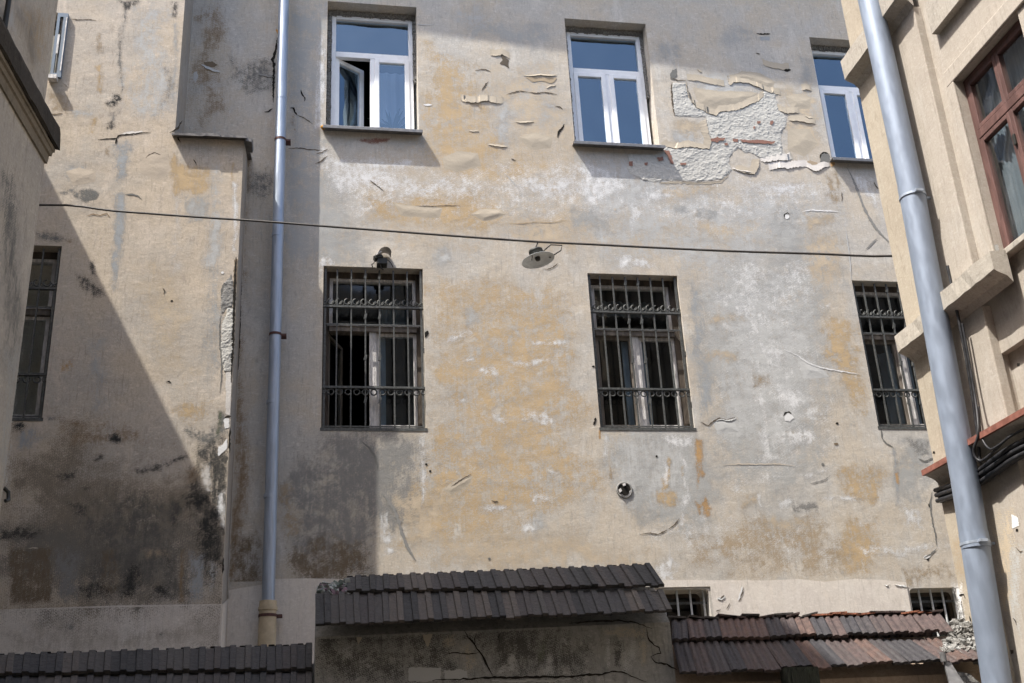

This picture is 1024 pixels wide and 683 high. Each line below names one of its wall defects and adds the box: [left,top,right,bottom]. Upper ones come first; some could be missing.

crack [98,121,196,163]
crack [266,37,311,123]
peeling [460,93,503,109]
peeling [490,48,510,68]
flaking render [524,73,556,88]
flaking render [627,68,835,185]
leakage [49,0,965,588]
flaking render [218,259,238,456]
crack [784,349,856,374]
leakage [0,162,274,654]
crack [432,619,677,682]